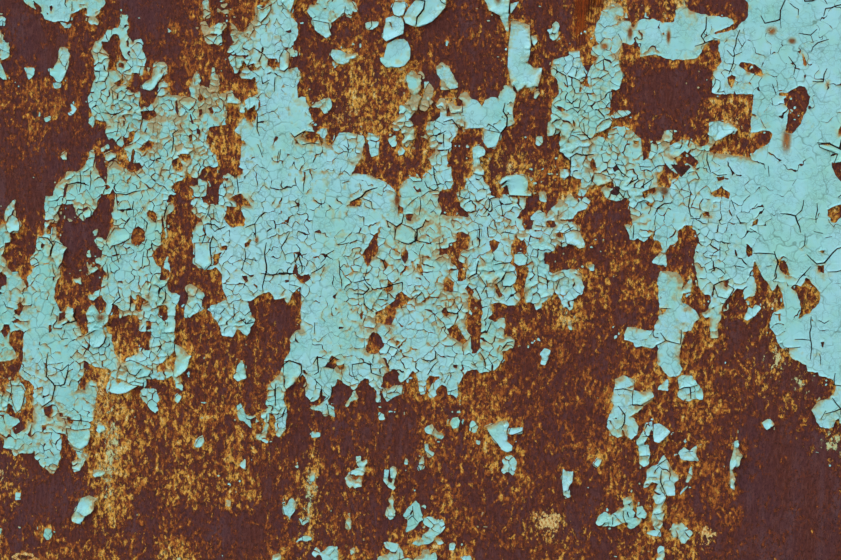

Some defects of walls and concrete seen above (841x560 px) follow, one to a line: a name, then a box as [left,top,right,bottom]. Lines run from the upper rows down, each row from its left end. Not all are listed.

peeling [0,0,590,475]
crack [242,213,403,312]
crack [351,166,440,267]
peeling [547,0,841,429]
crack [781,200,841,283]
corrosion [96,373,119,498]
crack [274,355,381,420]
peeling [596,375,699,537]
corrosion [12,552,40,560]
peeling [377,458,456,560]
corrosion [532,511,560,541]
corrosion [699,526,716,550]